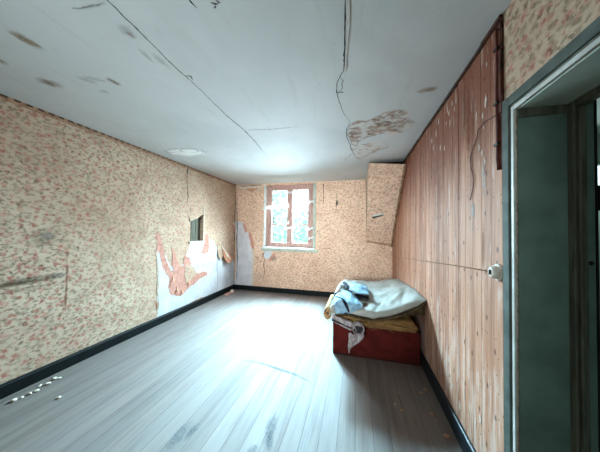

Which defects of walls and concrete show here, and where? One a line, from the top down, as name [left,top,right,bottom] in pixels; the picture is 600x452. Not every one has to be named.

crack [76,0,290,160]
crack [336,0,359,159]
peeling [347,110,415,146]
peeling [156,221,255,317]